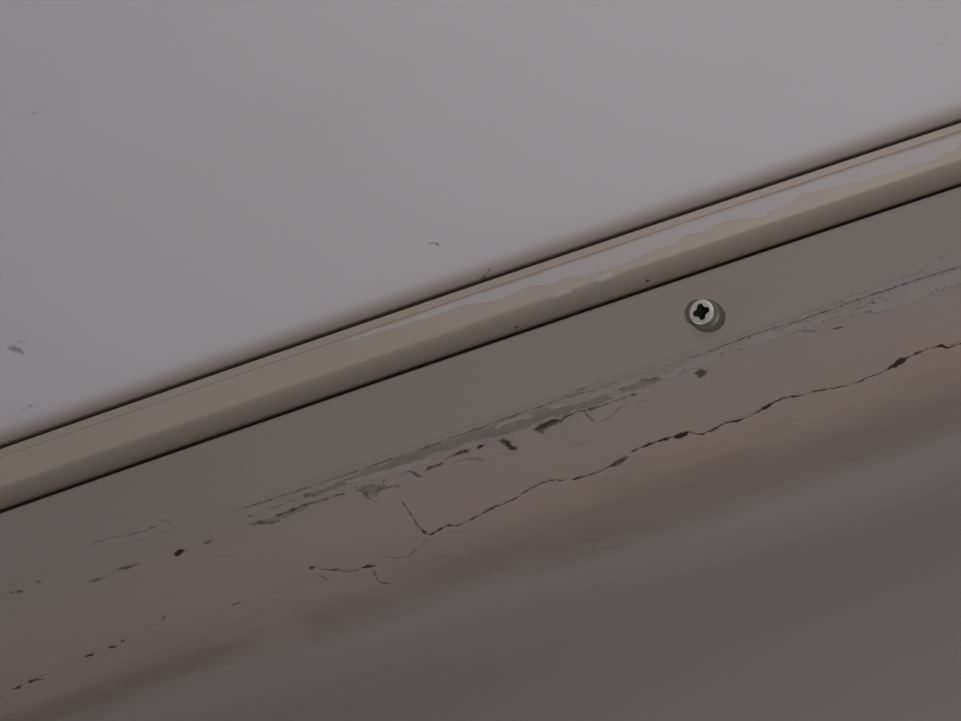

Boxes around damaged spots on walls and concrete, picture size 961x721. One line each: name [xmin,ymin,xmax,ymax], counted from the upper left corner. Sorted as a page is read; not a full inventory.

peeling [259,377,661,525]
crack [632,343,961,452]